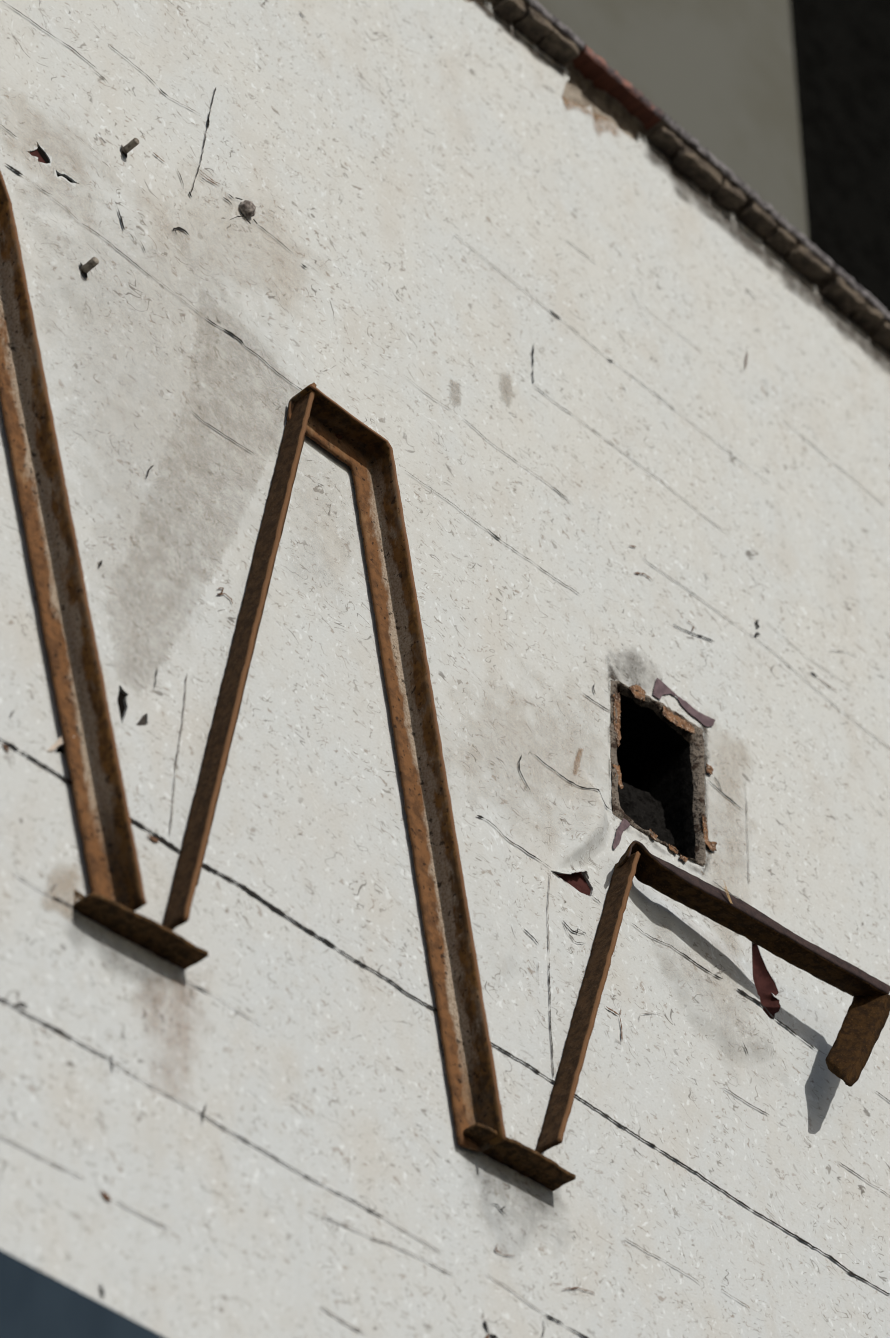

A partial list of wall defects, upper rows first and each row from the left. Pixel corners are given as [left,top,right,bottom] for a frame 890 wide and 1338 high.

peeling [653,678,715,727]
crack [0,739,72,785]
crack [519,755,611,810]
spalling [617,752,642,790]
crack [477,815,551,868]
peeling [613,818,630,849]
crack [10,869,74,908]
crack [130,817,437,1011]
crack [634,924,826,1055]
crack [0,998,452,1275]
crack [491,1042,890,1294]
crack [487,1245,594,1338]